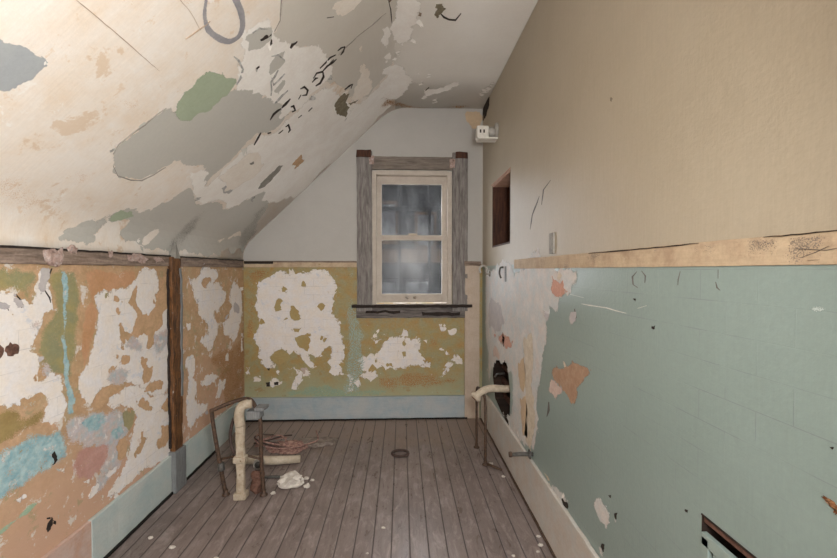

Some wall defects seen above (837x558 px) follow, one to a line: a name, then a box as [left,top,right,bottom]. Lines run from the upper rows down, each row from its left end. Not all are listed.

peeling [0,0,462,499]
peeling [485,259,577,451]